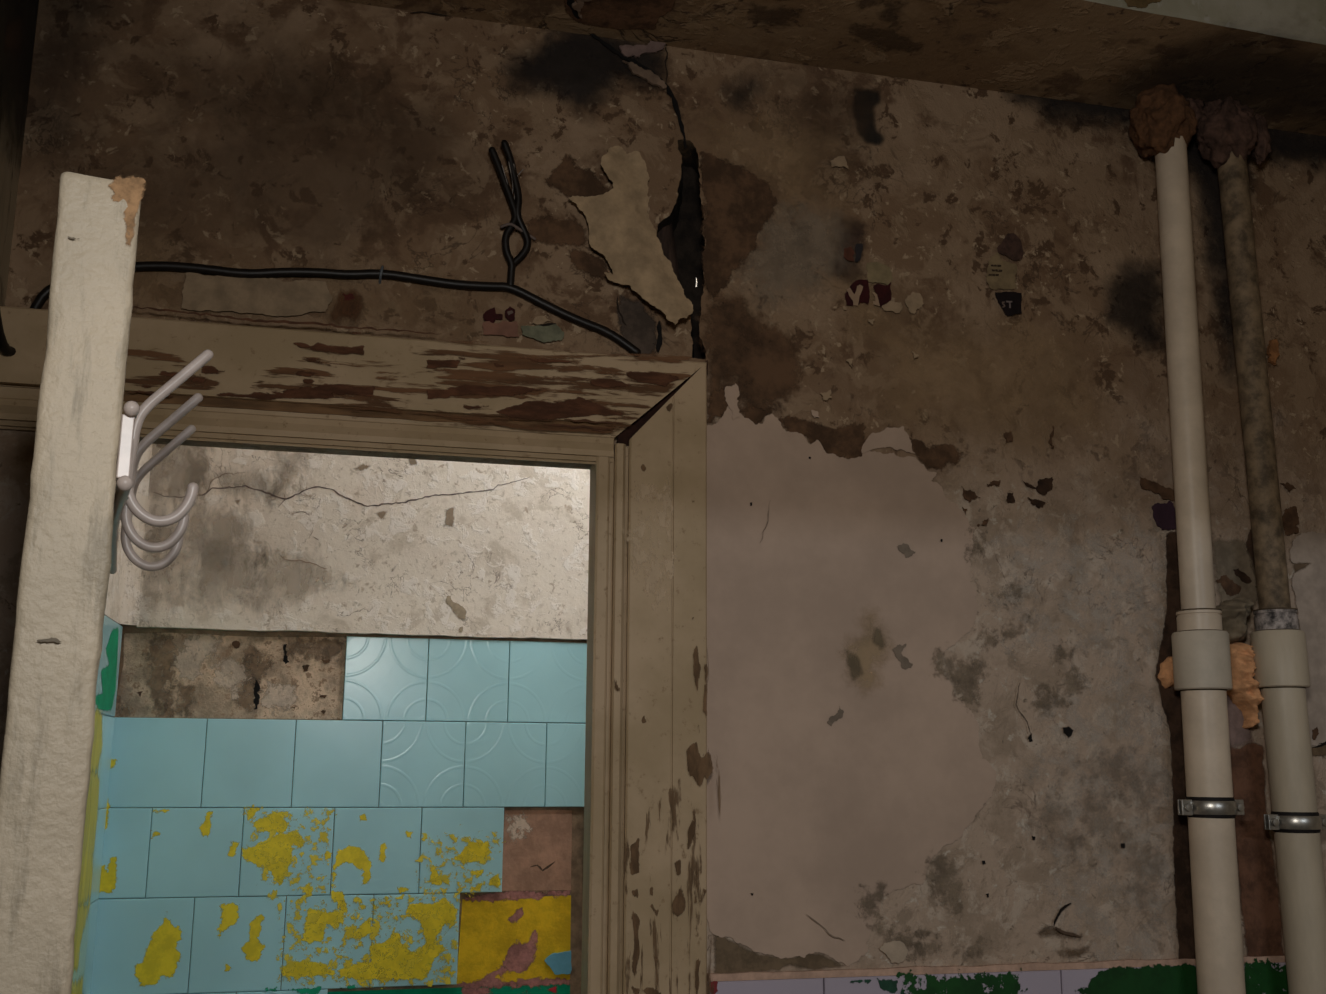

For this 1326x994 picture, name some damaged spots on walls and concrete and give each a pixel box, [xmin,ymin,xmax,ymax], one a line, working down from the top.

water stain [0,0,39,142]
water stain [511,32,664,105]
spalling [564,0,675,90]
crack [567,0,686,148]
crack [616,296,662,352]
crack [154,472,529,569]
peeling [114,139,1053,994]
mould [933,649,985,705]
water stain [860,884,939,960]
water stain [1040,928,1089,957]